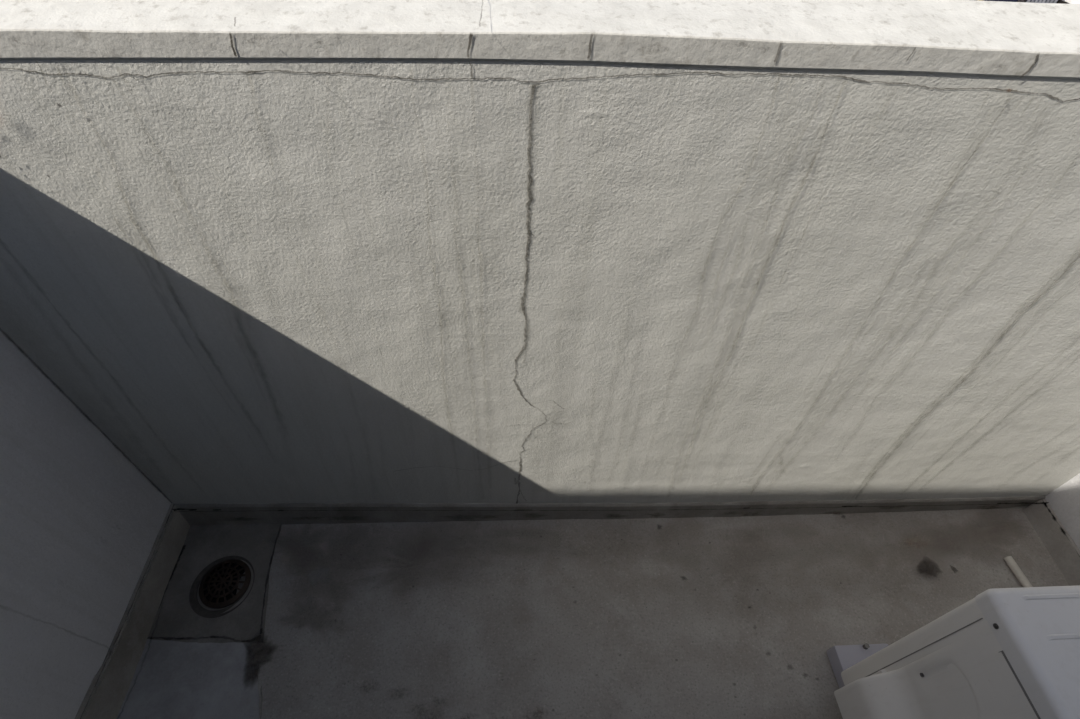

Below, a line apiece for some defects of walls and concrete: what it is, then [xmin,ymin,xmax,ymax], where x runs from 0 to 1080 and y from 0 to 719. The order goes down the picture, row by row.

crack [0,13,1080,406]
damp [245,636,275,683]